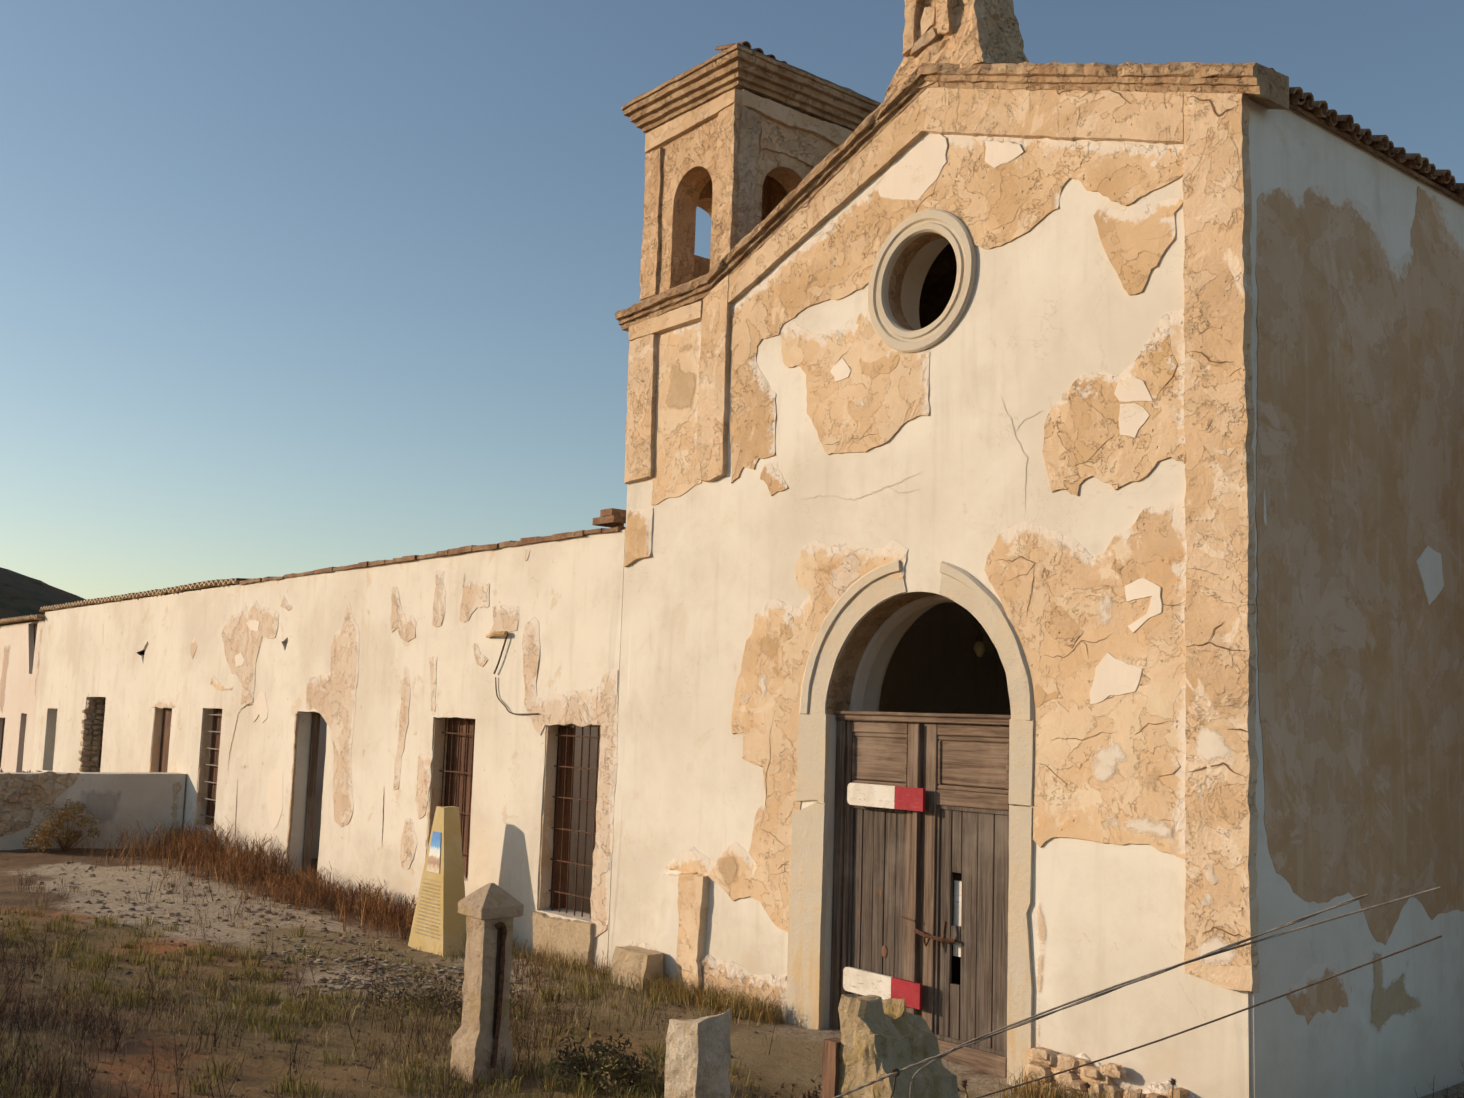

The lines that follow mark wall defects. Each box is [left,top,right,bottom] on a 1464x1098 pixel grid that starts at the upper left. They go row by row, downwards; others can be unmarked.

peeling [210,595,293,723]
peeling [306,602,360,827]
peeling [391,570,619,938]
peeling [624,321,702,567]
peeling [666,539,909,932]
crack [801,472,922,501]
peeling [729,133,1184,496]
peeling [984,502,1222,859]
peeling [1042,308,1235,496]
peeling [1211,184,1464,946]
peeling [1286,962,1352,1025]